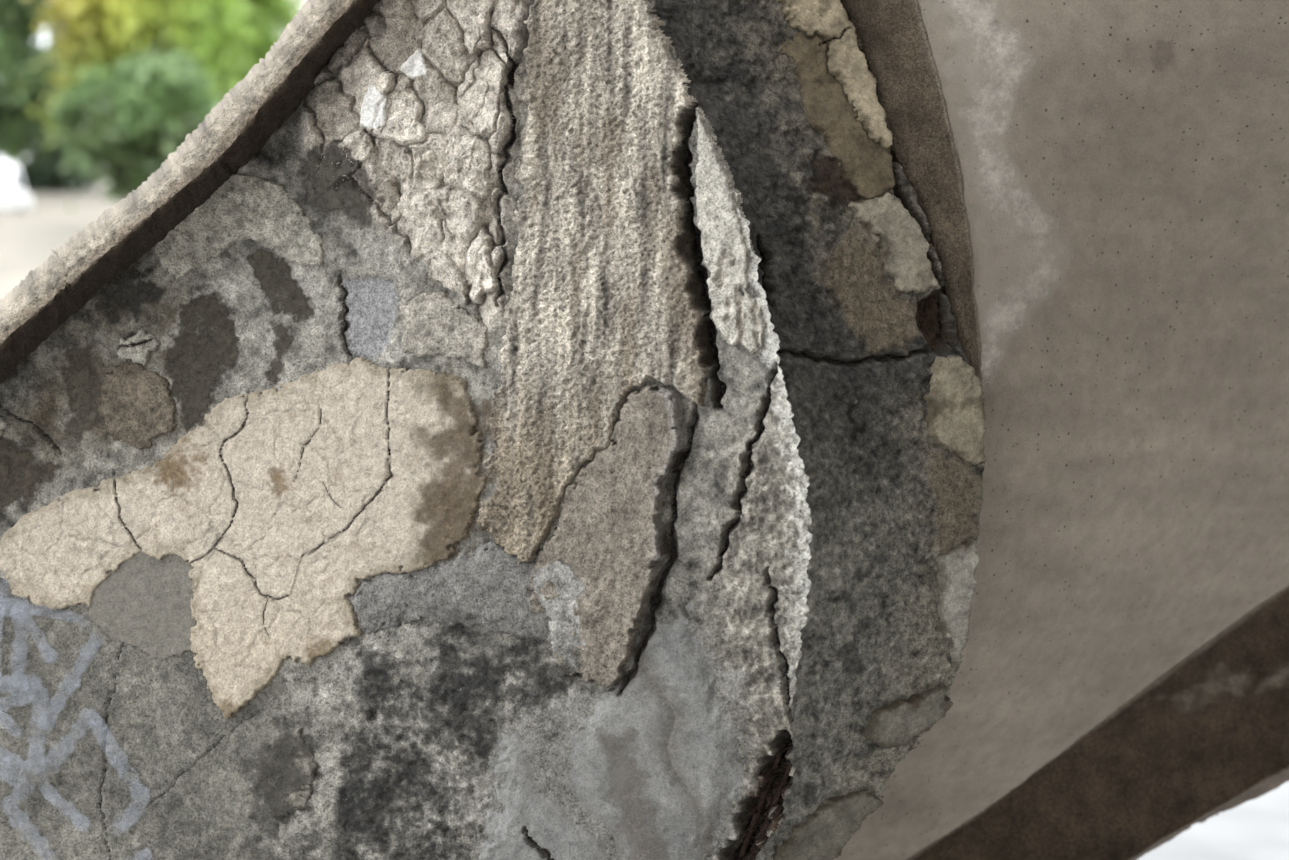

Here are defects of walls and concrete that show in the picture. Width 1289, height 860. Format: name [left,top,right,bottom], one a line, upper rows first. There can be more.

crack [214,405,283,636]
peeling [0,0,766,719]
crack [497,36,517,295]
crack [632,417,698,672]
crack [682,121,726,392]
crack [720,298,940,563]
spalling [807,156,862,205]
peeling [777,0,893,149]
spalling [916,290,957,354]
efflorescence [948,0,1058,379]
peeling [256,727,319,816]
corrosion [737,756,793,860]